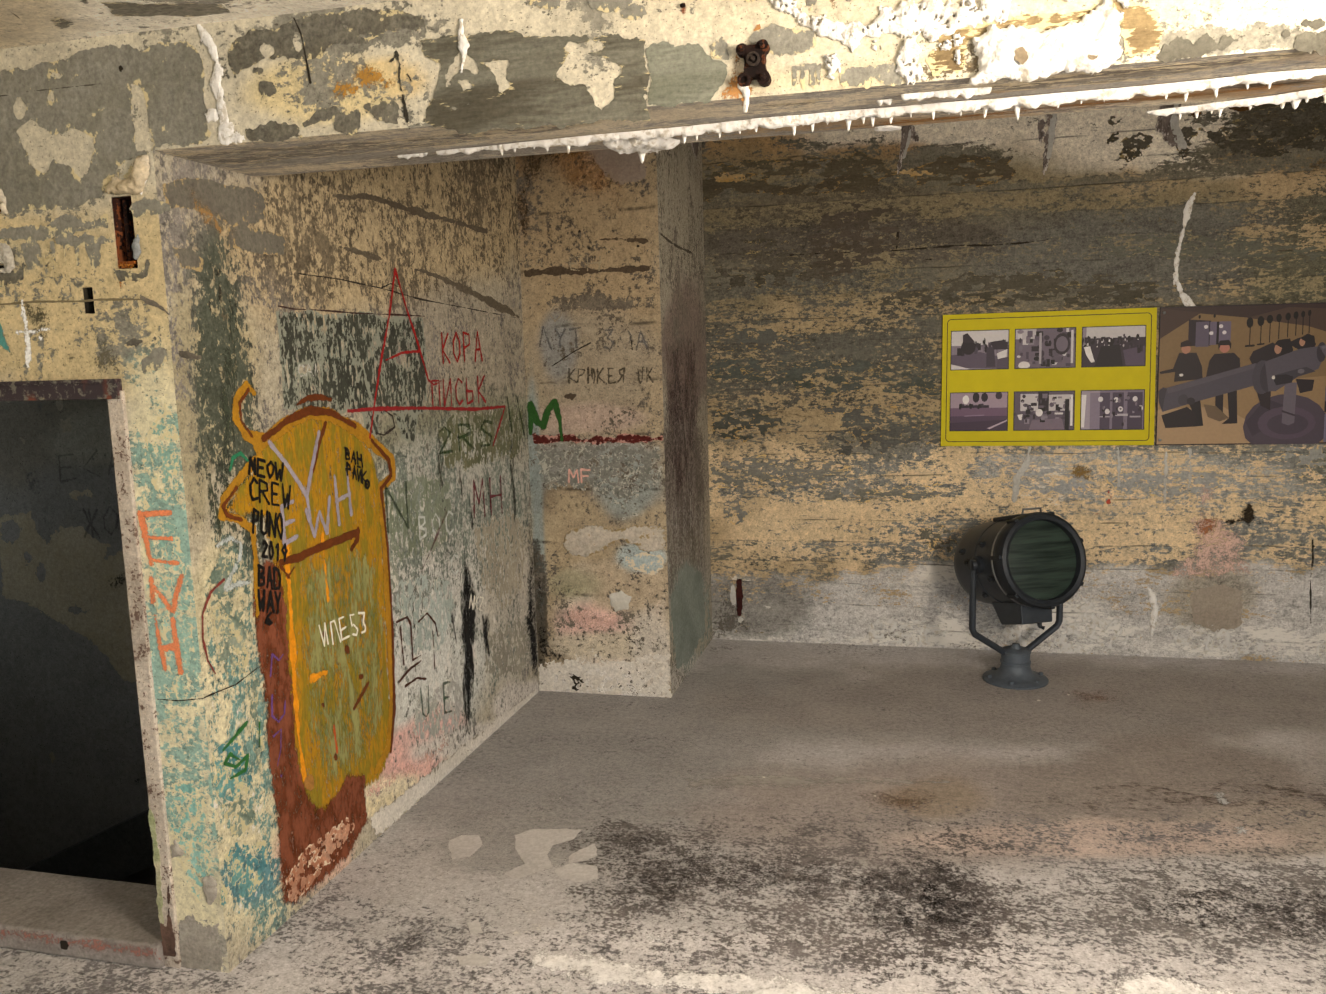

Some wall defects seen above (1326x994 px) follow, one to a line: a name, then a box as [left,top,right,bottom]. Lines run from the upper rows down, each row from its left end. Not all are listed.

peeling [80,0,230,17]
peeling [0,8,729,318]
peeling [588,0,648,21]
peeling [748,23,823,107]
peeling [703,151,1016,293]
leakage [397,0,1326,247]
peeling [865,233,1326,309]
peeling [925,0,1326,92]
efflorescence [1173,192,1196,306]
peeling [709,328,947,525]
peeling [0,511,136,683]
peeling [202,553,268,907]